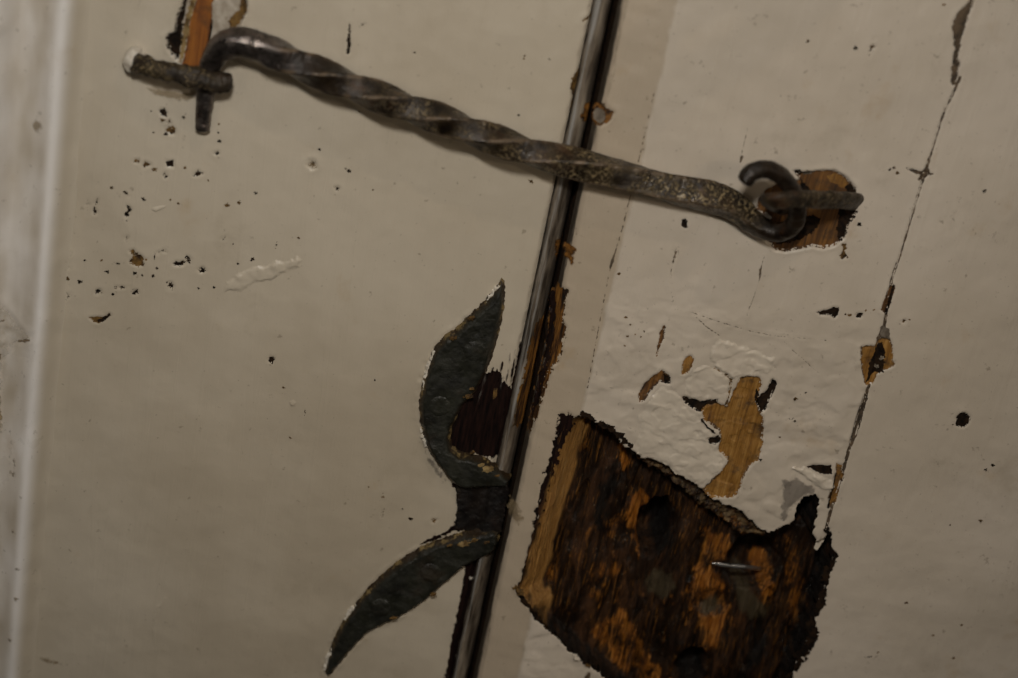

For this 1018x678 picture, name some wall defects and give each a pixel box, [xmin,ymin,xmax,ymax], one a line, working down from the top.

peeling [165,0,248,66]
peeling [794,169,856,192]
crack [889,76,962,287]
peeling [767,208,861,259]
peeling [512,281,569,434]
peeling [638,370,671,402]
peeling [817,284,895,318]
peeling [860,326,895,385]
crack [876,311,888,342]
peeling [682,367,777,498]
peeling [807,463,844,508]
crack [825,384,871,528]